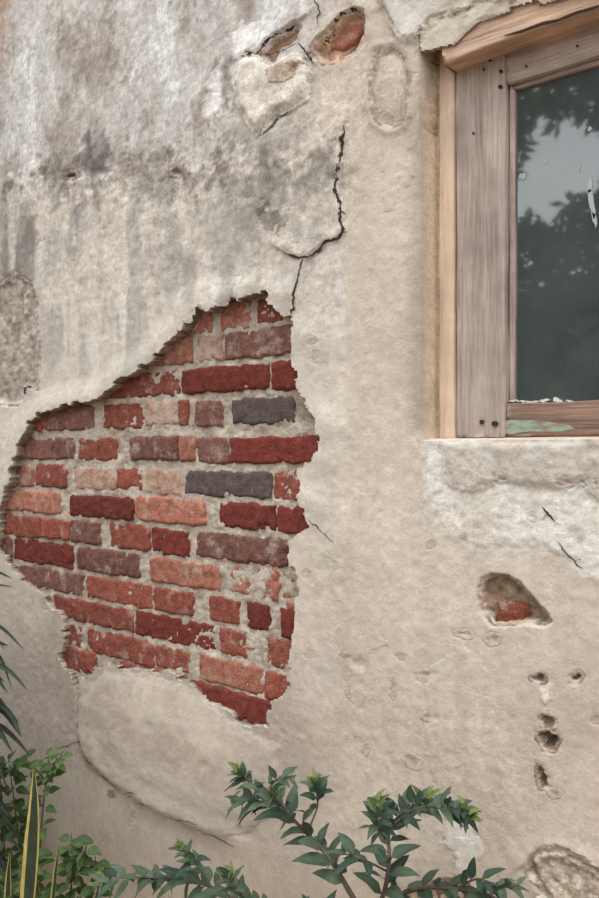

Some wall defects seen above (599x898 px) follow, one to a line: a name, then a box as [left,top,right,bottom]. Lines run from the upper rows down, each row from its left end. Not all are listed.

leakage [111,0,130,84]
leakage [200,19,261,141]
crack [233,0,365,63]
peeling [232,8,366,138]
leakage [355,2,440,212]
leakage [65,127,117,262]
leakage [155,117,346,323]
crack [284,125,346,315]
flaking render [0,271,320,728]
spalling [452,573,553,647]
spalling [528,671,549,685]
spalling [523,845,599,898]